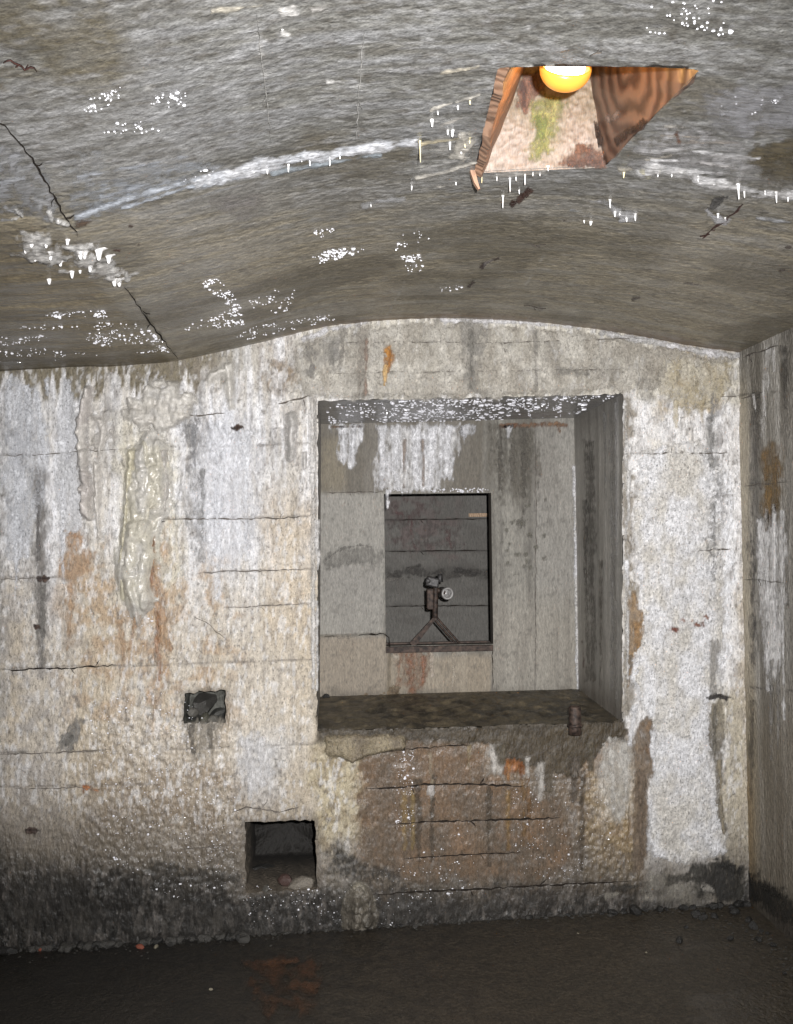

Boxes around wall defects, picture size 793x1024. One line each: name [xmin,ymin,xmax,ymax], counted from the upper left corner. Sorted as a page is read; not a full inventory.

crack [0,123,78,237]
crack [700,204,743,239]
crack [124,287,178,359]
corrosion [383,346,394,386]
corrosion [759,442,783,531]
leakage [294,320,793,925]
crack [367,777,528,793]
crack [406,851,515,859]
crack [394,817,560,831]
corrosion [504,758,532,839]